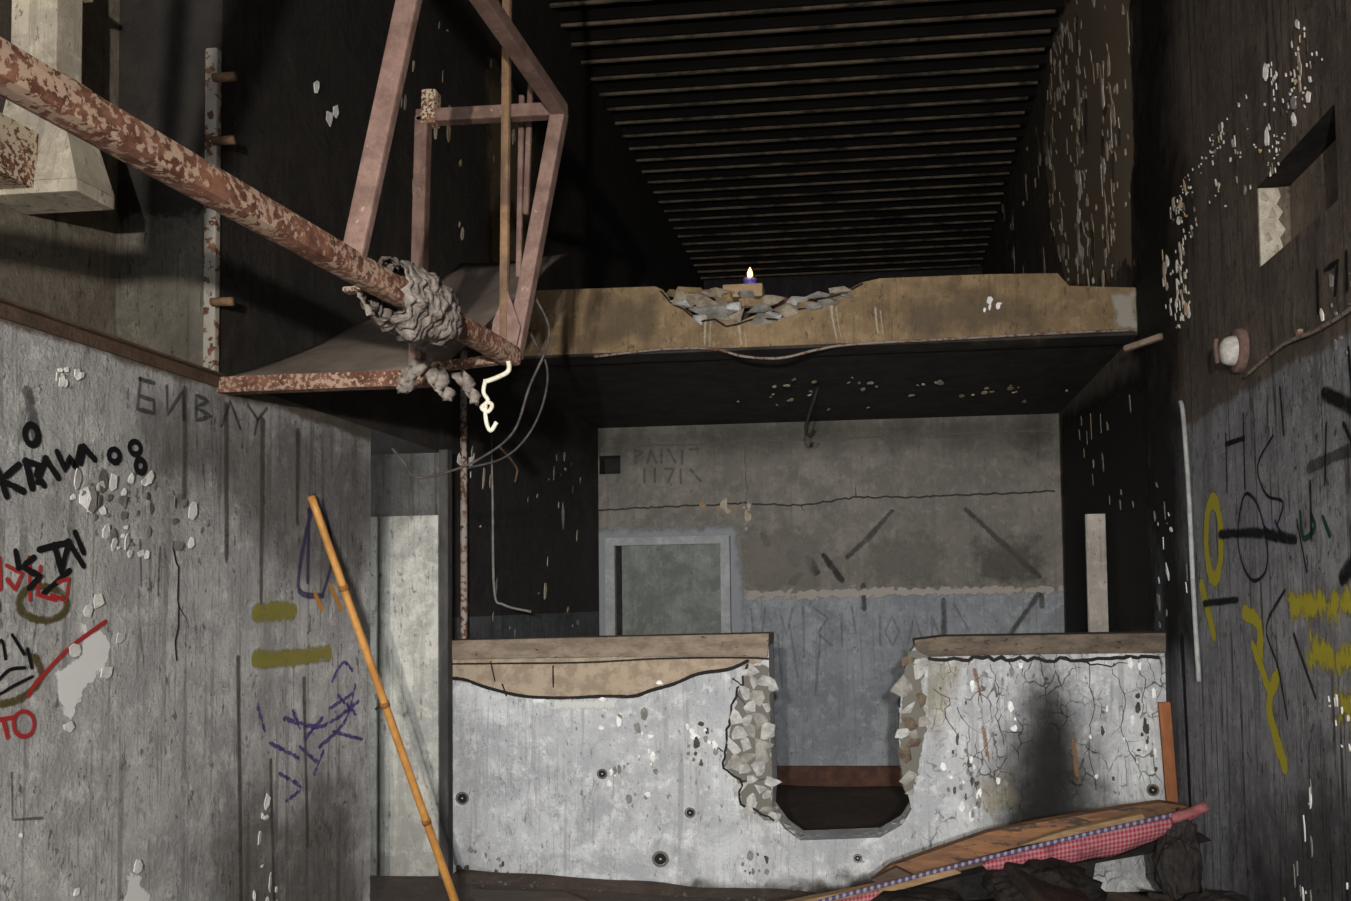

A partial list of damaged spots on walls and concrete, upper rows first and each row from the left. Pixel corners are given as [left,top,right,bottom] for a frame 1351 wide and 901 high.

peeling [1162,19,1323,328]
spalling [660,283,863,327]
crack [598,488,1055,511]
crack [927,655,1160,790]
leakage [1019,739,1064,823]